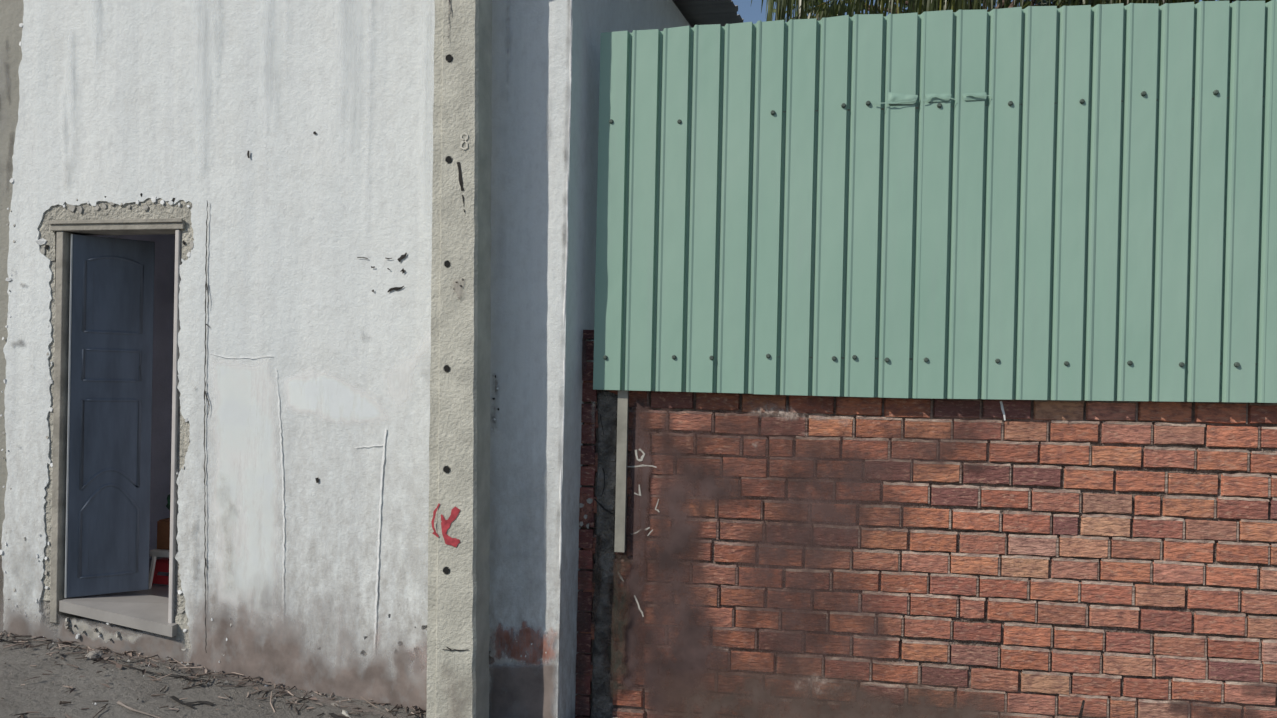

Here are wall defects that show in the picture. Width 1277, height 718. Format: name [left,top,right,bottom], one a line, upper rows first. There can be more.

water stain [0,556,427,718]
water stain [489,663,555,718]